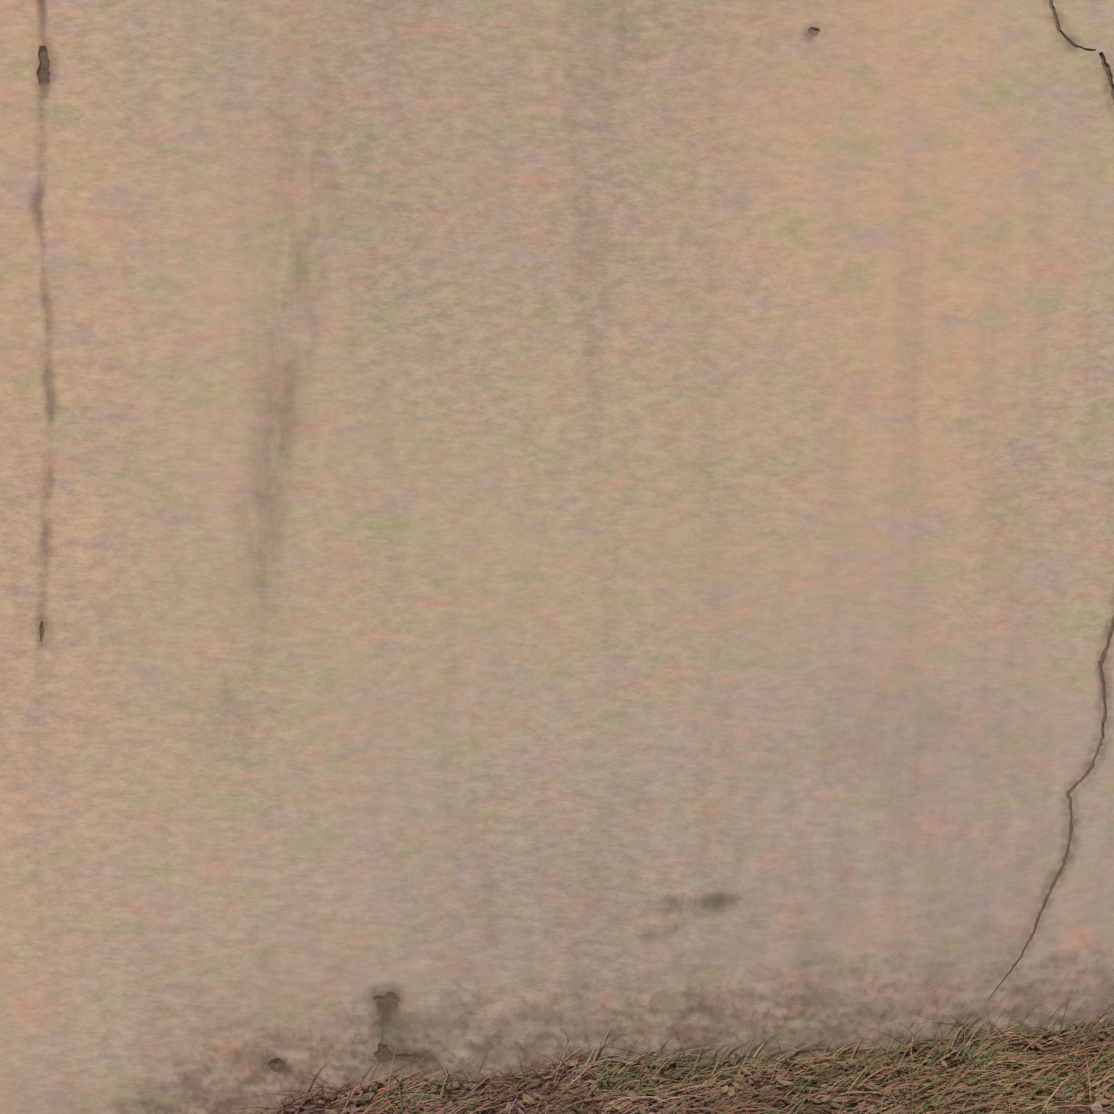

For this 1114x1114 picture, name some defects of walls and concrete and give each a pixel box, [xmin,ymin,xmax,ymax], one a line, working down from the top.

crack [36,46,50,84]
crack [1049,0,1114,100]
crack [37,621,45,642]
crack [987,615,1114,1001]